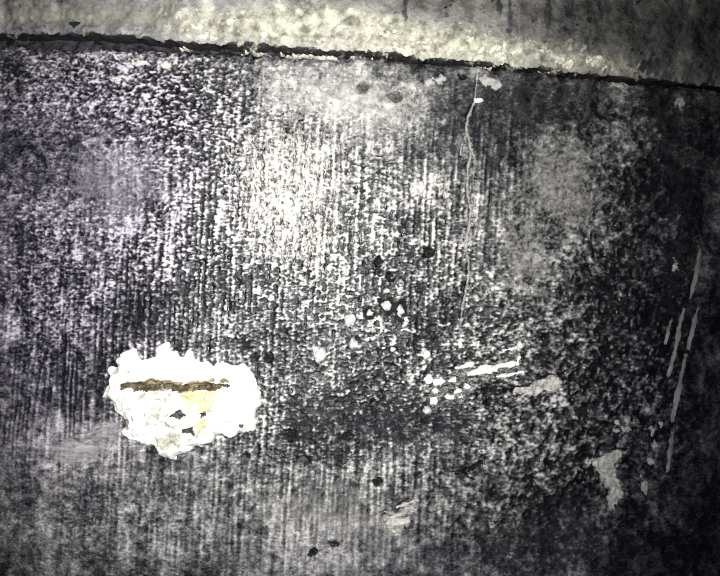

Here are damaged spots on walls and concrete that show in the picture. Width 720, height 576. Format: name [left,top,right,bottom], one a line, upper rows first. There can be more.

crack [459,73,483,330]